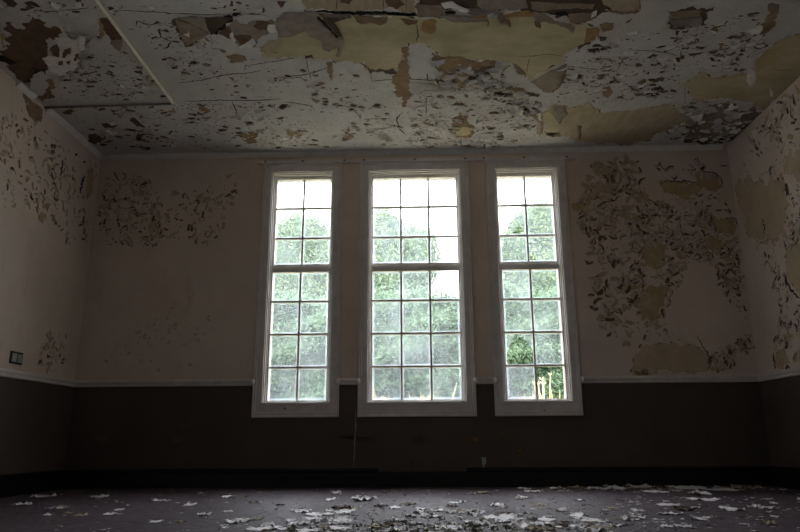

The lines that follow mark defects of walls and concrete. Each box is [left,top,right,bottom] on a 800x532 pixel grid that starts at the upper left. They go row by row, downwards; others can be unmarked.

peeling [0,0,800,376]